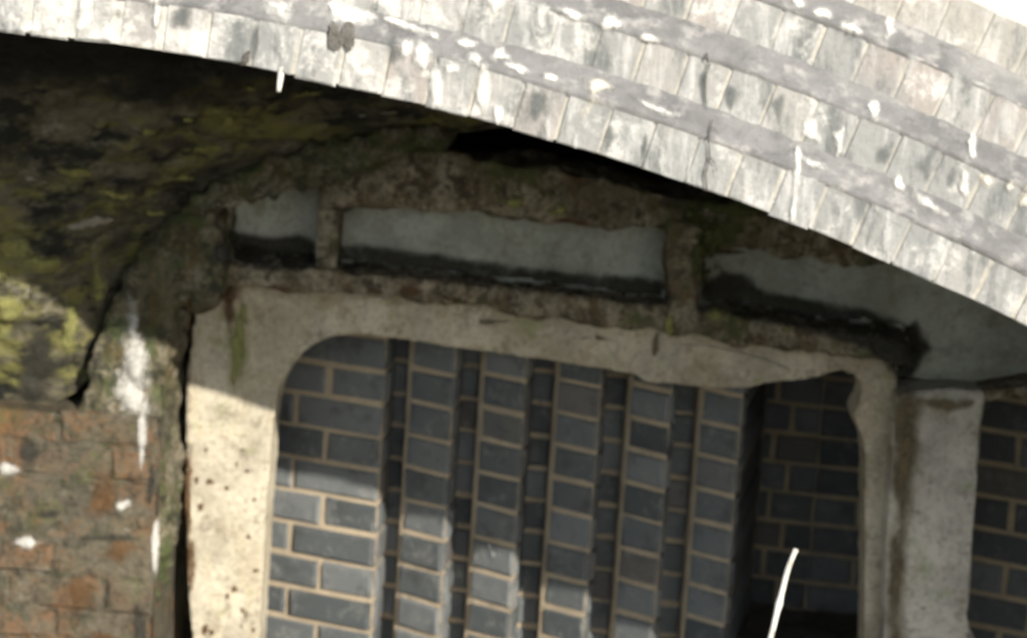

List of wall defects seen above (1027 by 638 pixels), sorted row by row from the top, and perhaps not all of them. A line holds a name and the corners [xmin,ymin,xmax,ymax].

crack [704,53,717,192]
water stain [65,216,114,231]
water stain [20,331,53,402]